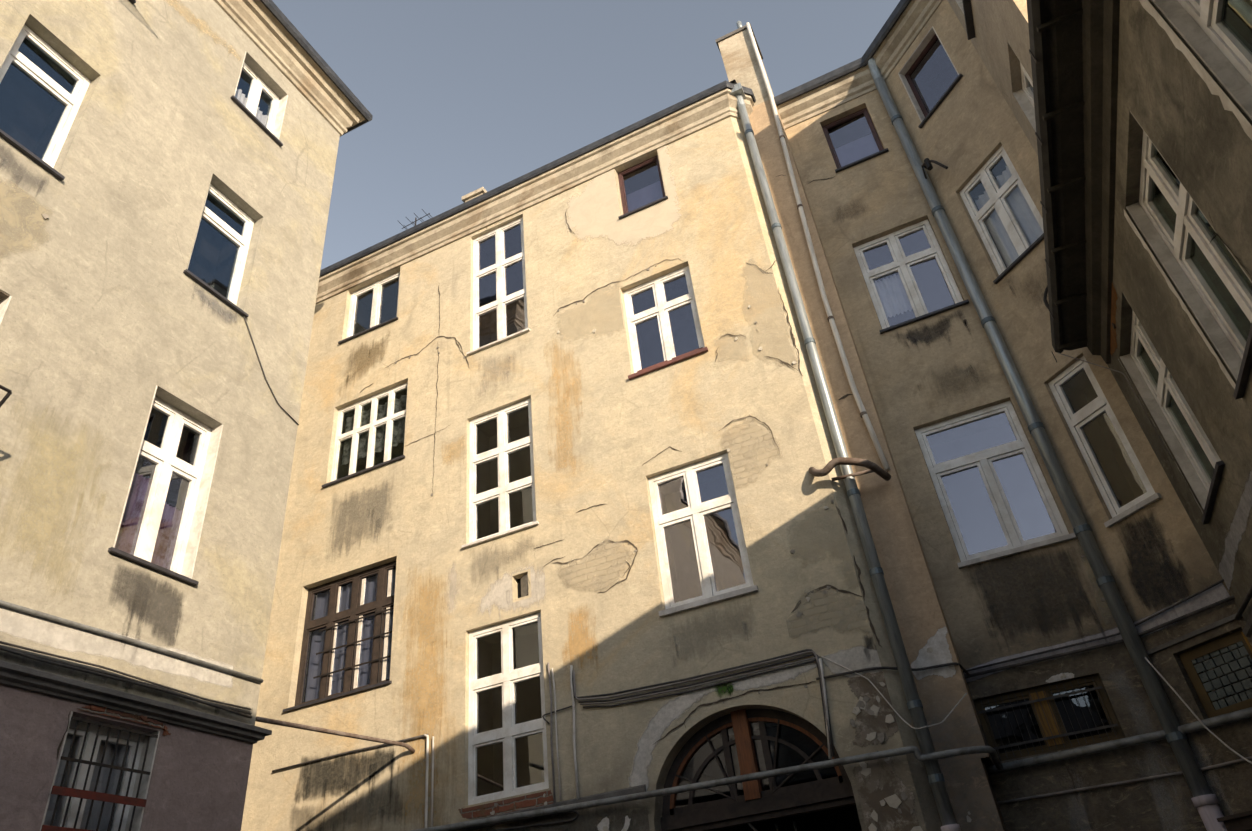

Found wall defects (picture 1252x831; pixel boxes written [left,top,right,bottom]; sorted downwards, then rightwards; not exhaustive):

flaking render [715,305,797,370]
crack [362,286,469,496]
flaking render [911,626,956,680]
flaking render [848,671,899,747]
damp [295,750,394,802]